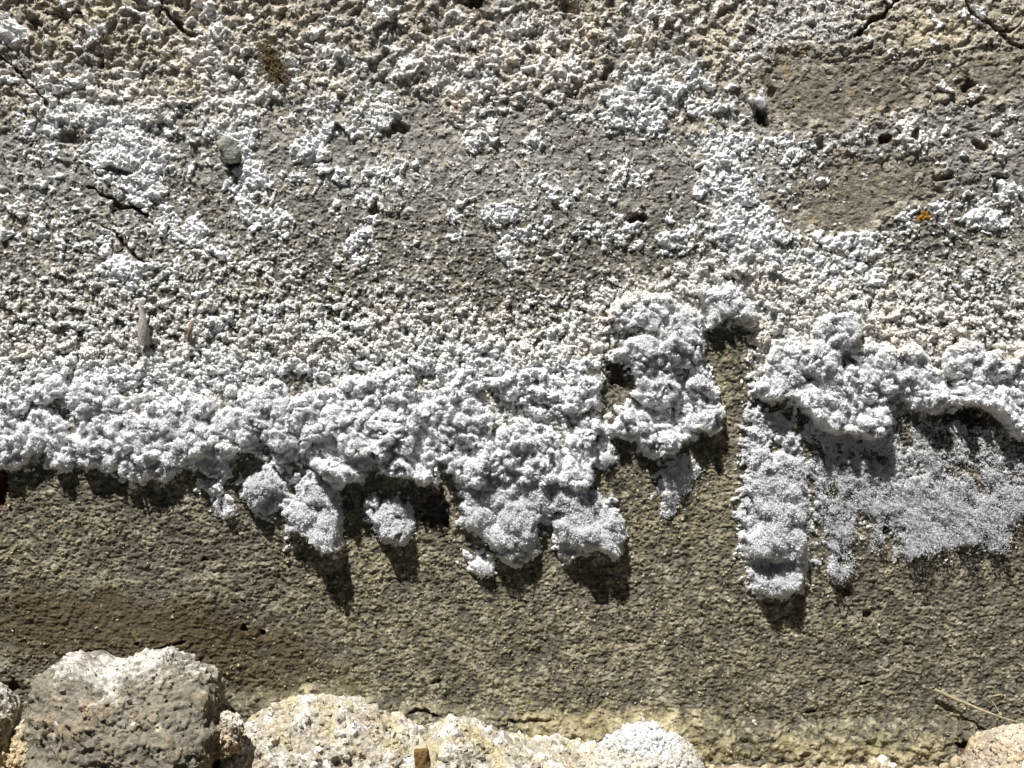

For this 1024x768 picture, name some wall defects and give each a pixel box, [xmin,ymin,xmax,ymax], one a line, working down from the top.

crack [854,0,900,37]
crack [965,0,1022,50]
crack [86,185,152,264]
damp [0,228,1024,586]